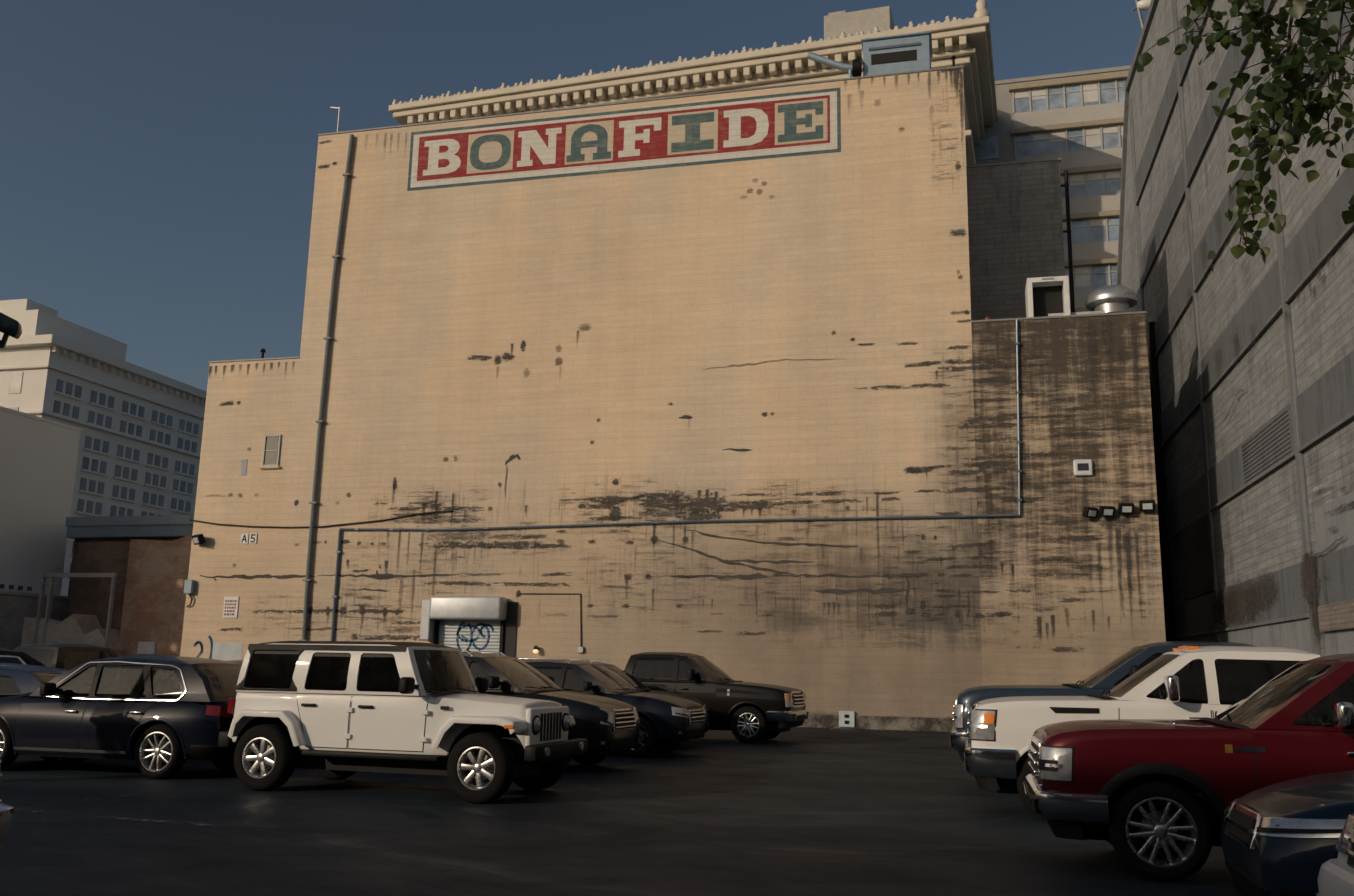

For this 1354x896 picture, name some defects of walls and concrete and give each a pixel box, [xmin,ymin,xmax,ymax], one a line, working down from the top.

damp [1102,515,1140,600]
damp [1037,615,1083,652]